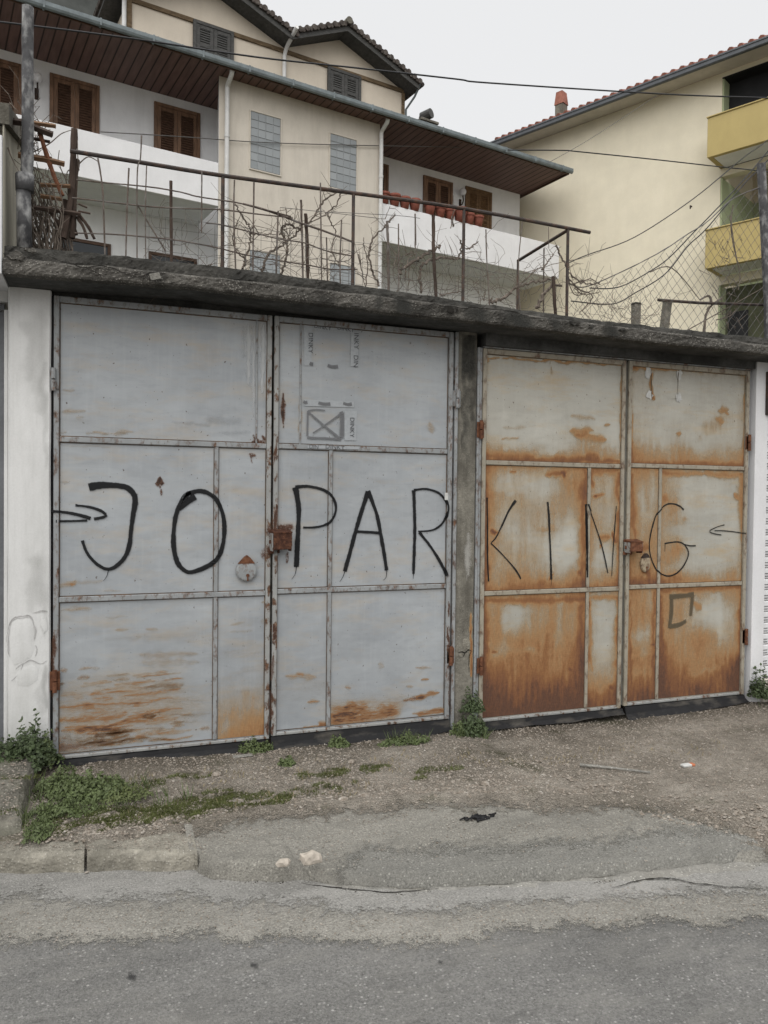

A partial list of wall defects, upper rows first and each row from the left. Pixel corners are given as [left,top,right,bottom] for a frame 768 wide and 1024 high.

rust [487,356,702,400]
rust [261,504,293,558]
rust [469,406,744,718]
rust [50,635,191,752]
rust [303,667,450,728]
crack [304,883,438,893]
crack [612,877,761,889]